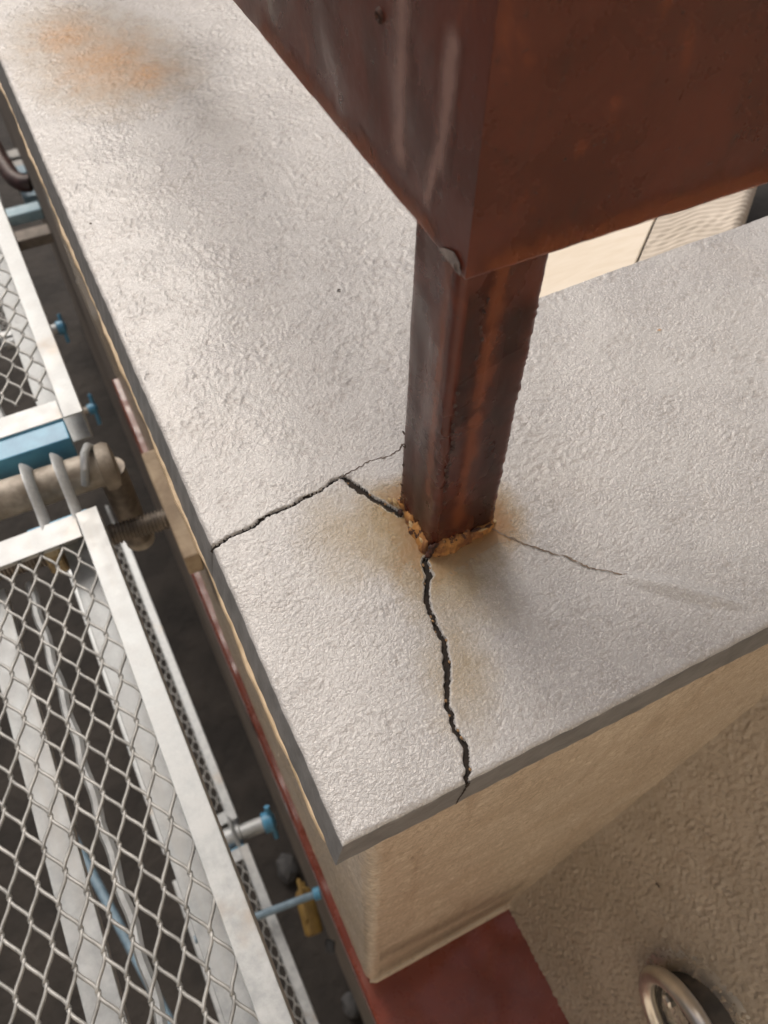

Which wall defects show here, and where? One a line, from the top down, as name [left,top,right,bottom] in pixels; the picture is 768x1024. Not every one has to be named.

crack [210,444,403,553]
corrosion [375,481,518,585]
crack [491,529,625,575]
crack [422,560,471,805]